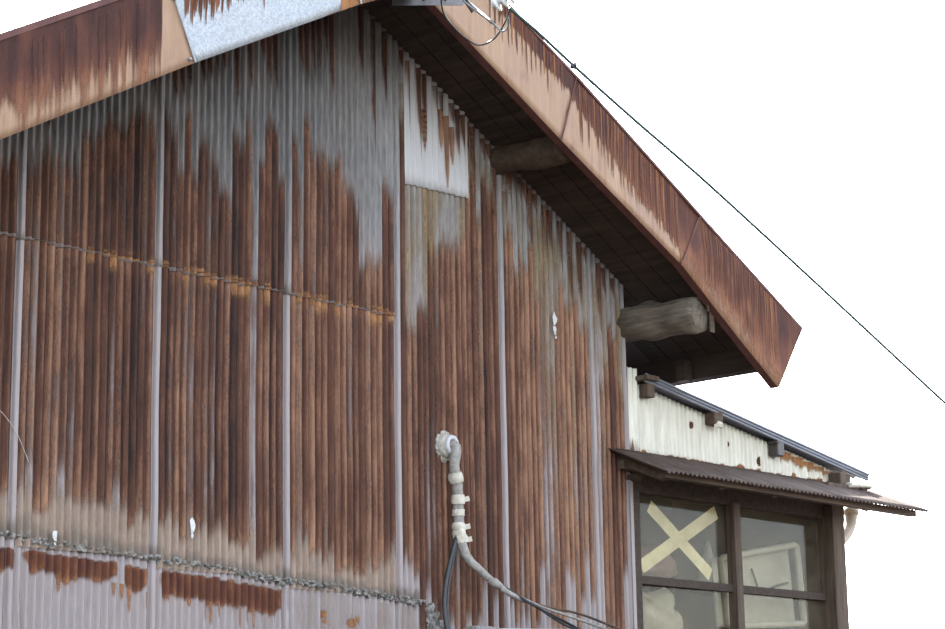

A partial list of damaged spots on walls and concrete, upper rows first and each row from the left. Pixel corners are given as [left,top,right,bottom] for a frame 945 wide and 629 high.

rust [0,0,162,131]
rust [185,0,244,25]
rust [173,33,279,95]
rust [300,0,387,136]
rust [490,0,802,387]
rust [0,50,646,629]